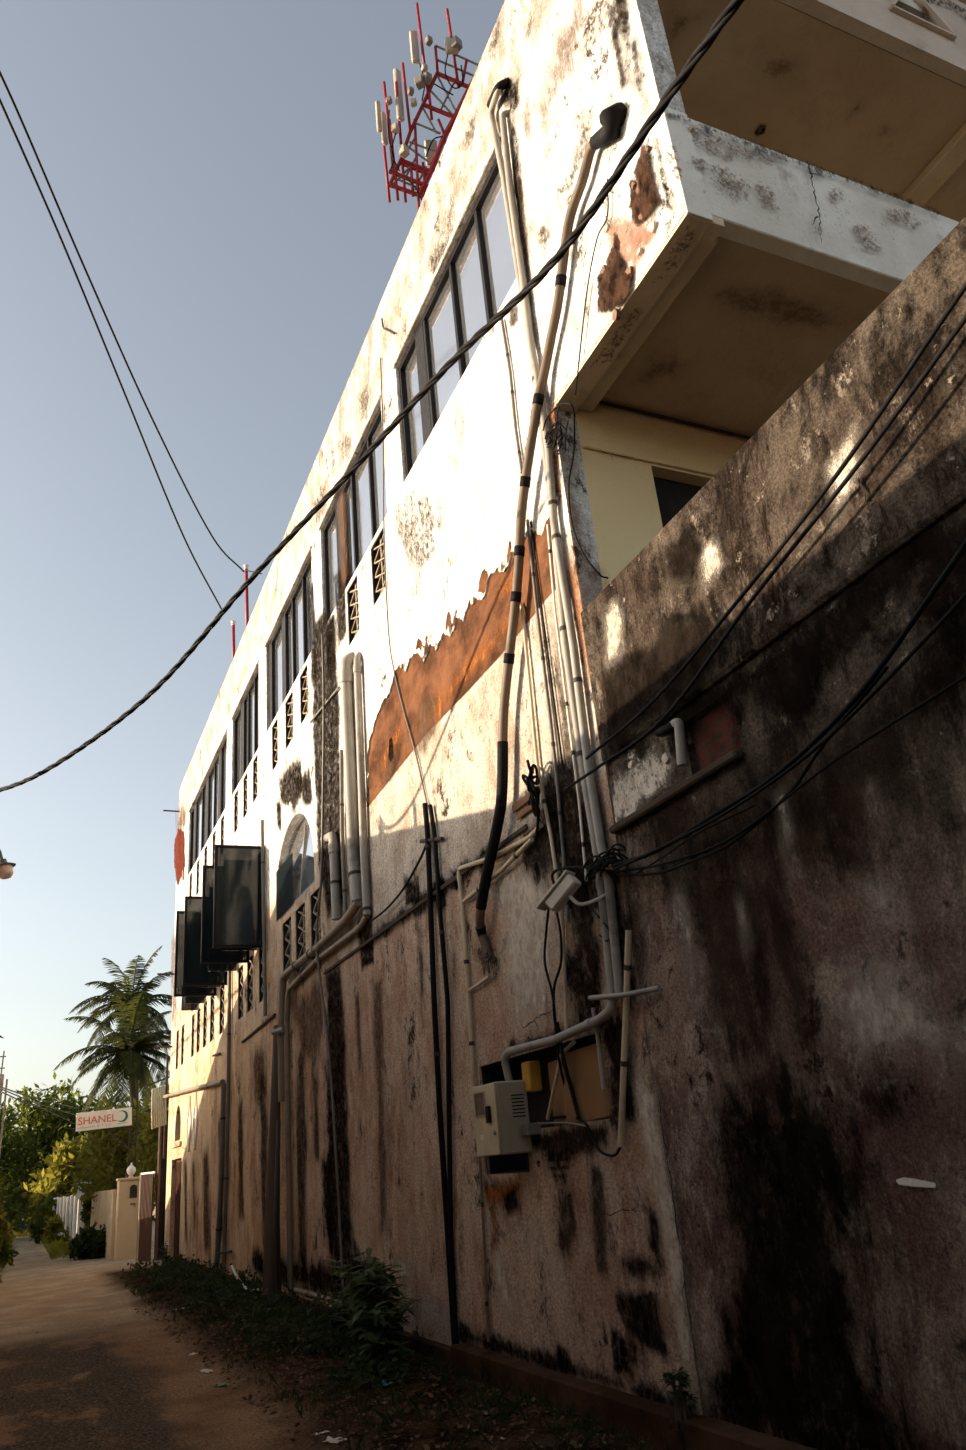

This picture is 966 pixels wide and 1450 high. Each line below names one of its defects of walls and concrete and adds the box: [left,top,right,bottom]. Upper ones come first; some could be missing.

mould [667,111,939,214]
crack [806,161,822,243]
leakage [830,442,856,500]
leakage [307,495,347,916]
peeling [366,517,556,806]
leakage [281,961,386,1300]
leakage [358,525,940,1450]